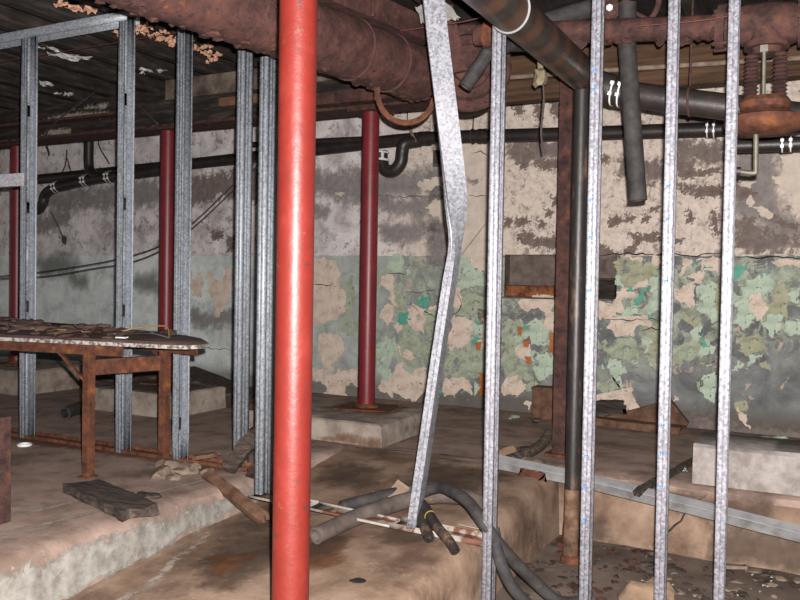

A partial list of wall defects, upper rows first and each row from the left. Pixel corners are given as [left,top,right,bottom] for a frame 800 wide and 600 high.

water stain [134,180,160,209]
water stain [192,168,236,207]
water stain [506,142,559,165]
water stain [645,157,665,186]
water stain [677,138,725,177]
water stain [735,152,800,255]
peeling [376,253,438,402]
peeling [439,145,490,398]
peeling [501,294,555,410]
peeling [596,205,663,410]
peeling [672,256,722,403]
peeling [732,258,800,371]